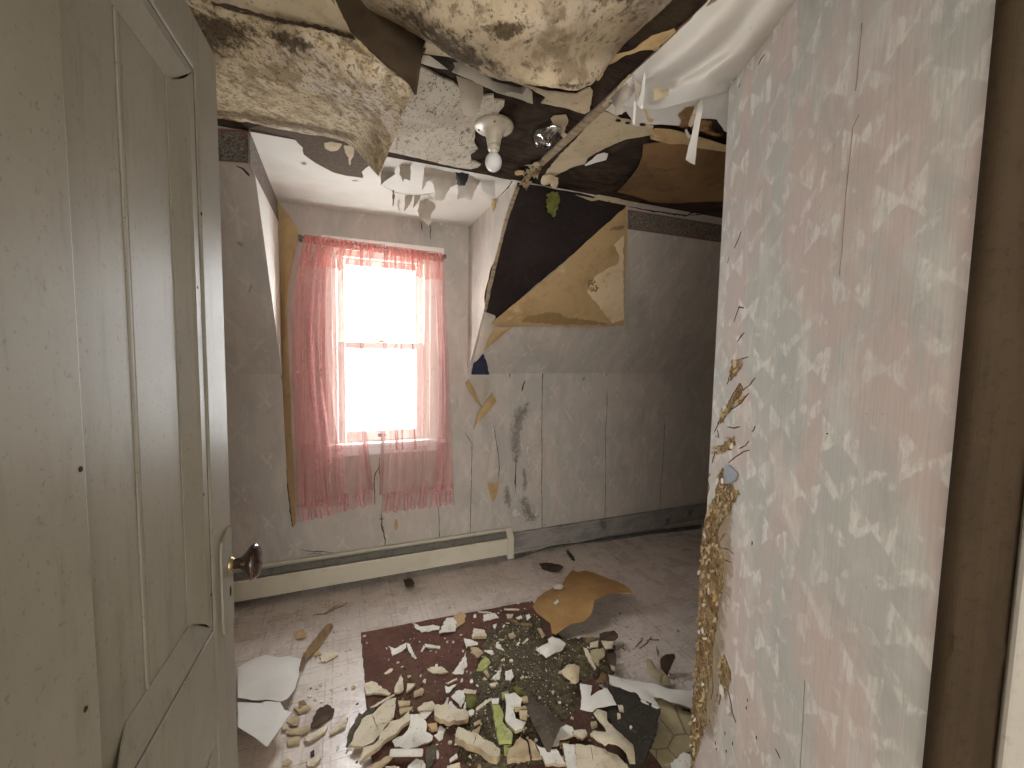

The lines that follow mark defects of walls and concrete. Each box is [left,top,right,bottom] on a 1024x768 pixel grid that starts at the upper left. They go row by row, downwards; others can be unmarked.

mould [389,2,524,72]
leakage [636,0,694,40]
peeling [248,125,369,181]
peeling [465,182,627,430]
crack [373,458,386,543]
flaking render [689,357,756,768]